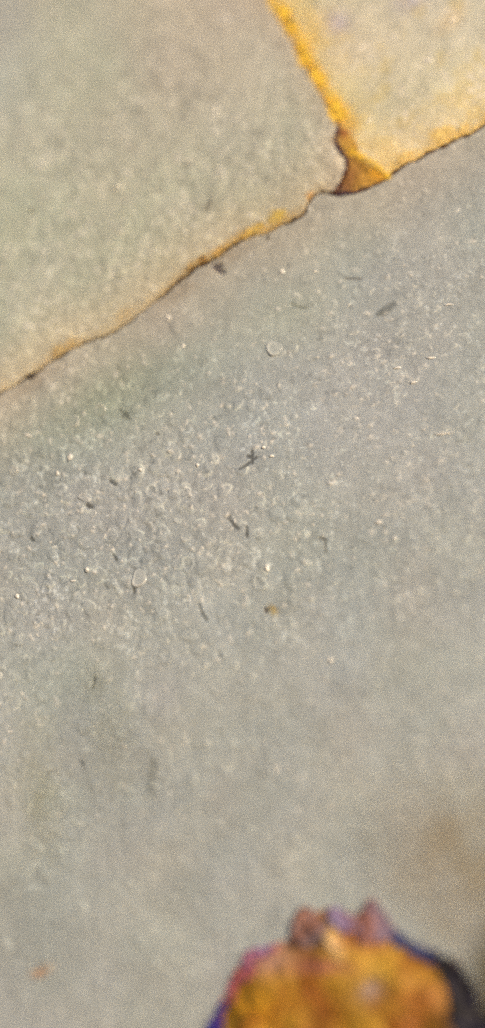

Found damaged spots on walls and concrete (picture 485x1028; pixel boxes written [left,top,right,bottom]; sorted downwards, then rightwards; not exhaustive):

corrosion [267,0,357,159]
crack [156,2,485,300]
spalling [329,126,391,196]
corrosion [188,210,291,269]
crack [0,316,136,394]